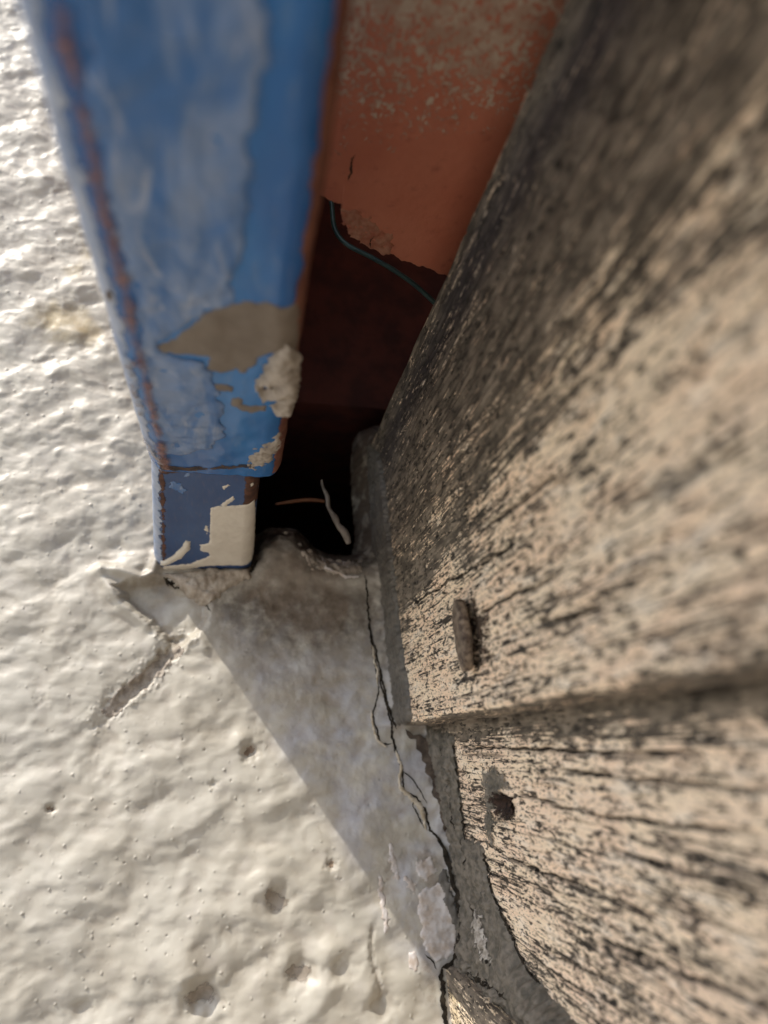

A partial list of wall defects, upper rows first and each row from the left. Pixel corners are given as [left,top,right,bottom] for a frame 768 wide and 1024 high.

spalling [340,208,394,256]
peeling [247,432,283,470]
crack [365,577,506,1024]